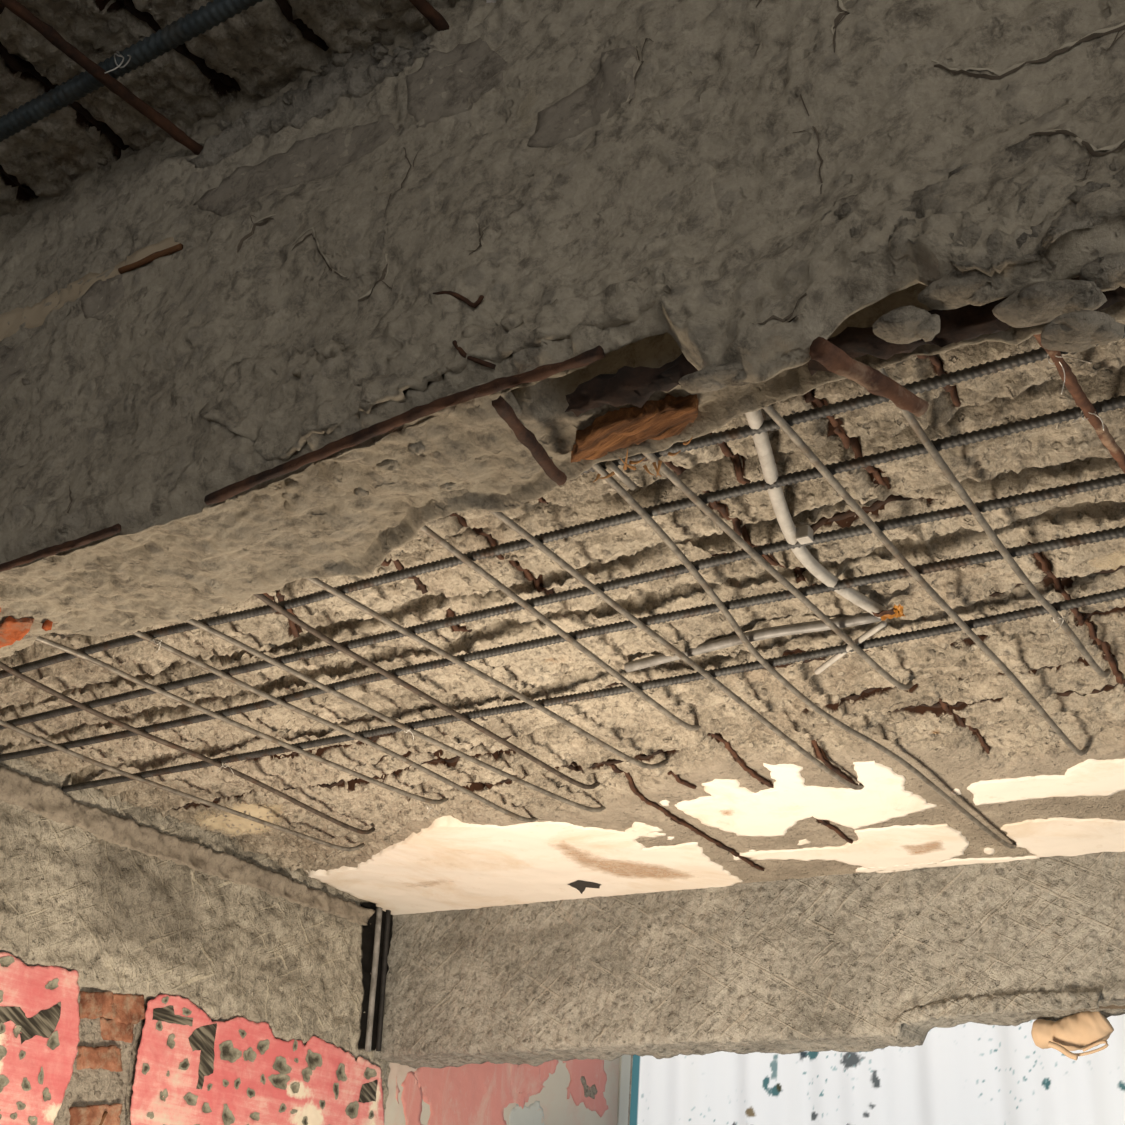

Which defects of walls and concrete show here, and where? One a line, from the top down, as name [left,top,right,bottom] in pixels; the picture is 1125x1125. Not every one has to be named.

crack [829,0,850,52]
crack [932,22,1125,80]
spalling [199,280,671,461]
rust [204,340,698,505]
rust [802,296,1012,532]
peeling [0,334,1125,925]
rust [825,683,1004,754]
rust [998,657,1090,675]
rust [1027,542,1125,697]
flaking render [0,986,175,1125]
spalling [183,1029,322,1125]
peeling [396,1059,609,1125]